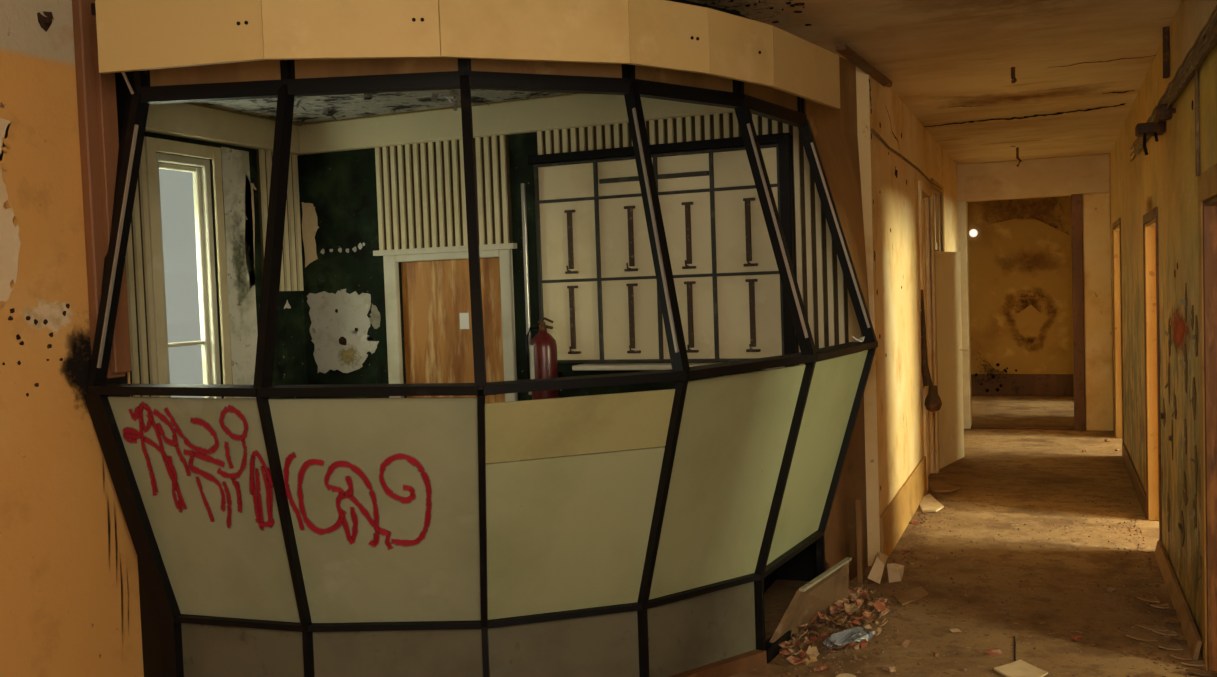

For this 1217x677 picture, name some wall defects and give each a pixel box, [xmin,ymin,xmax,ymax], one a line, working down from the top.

peeling [0,118,79,349]
peeling [307,289,381,373]
leakage [1006,290,1056,350]